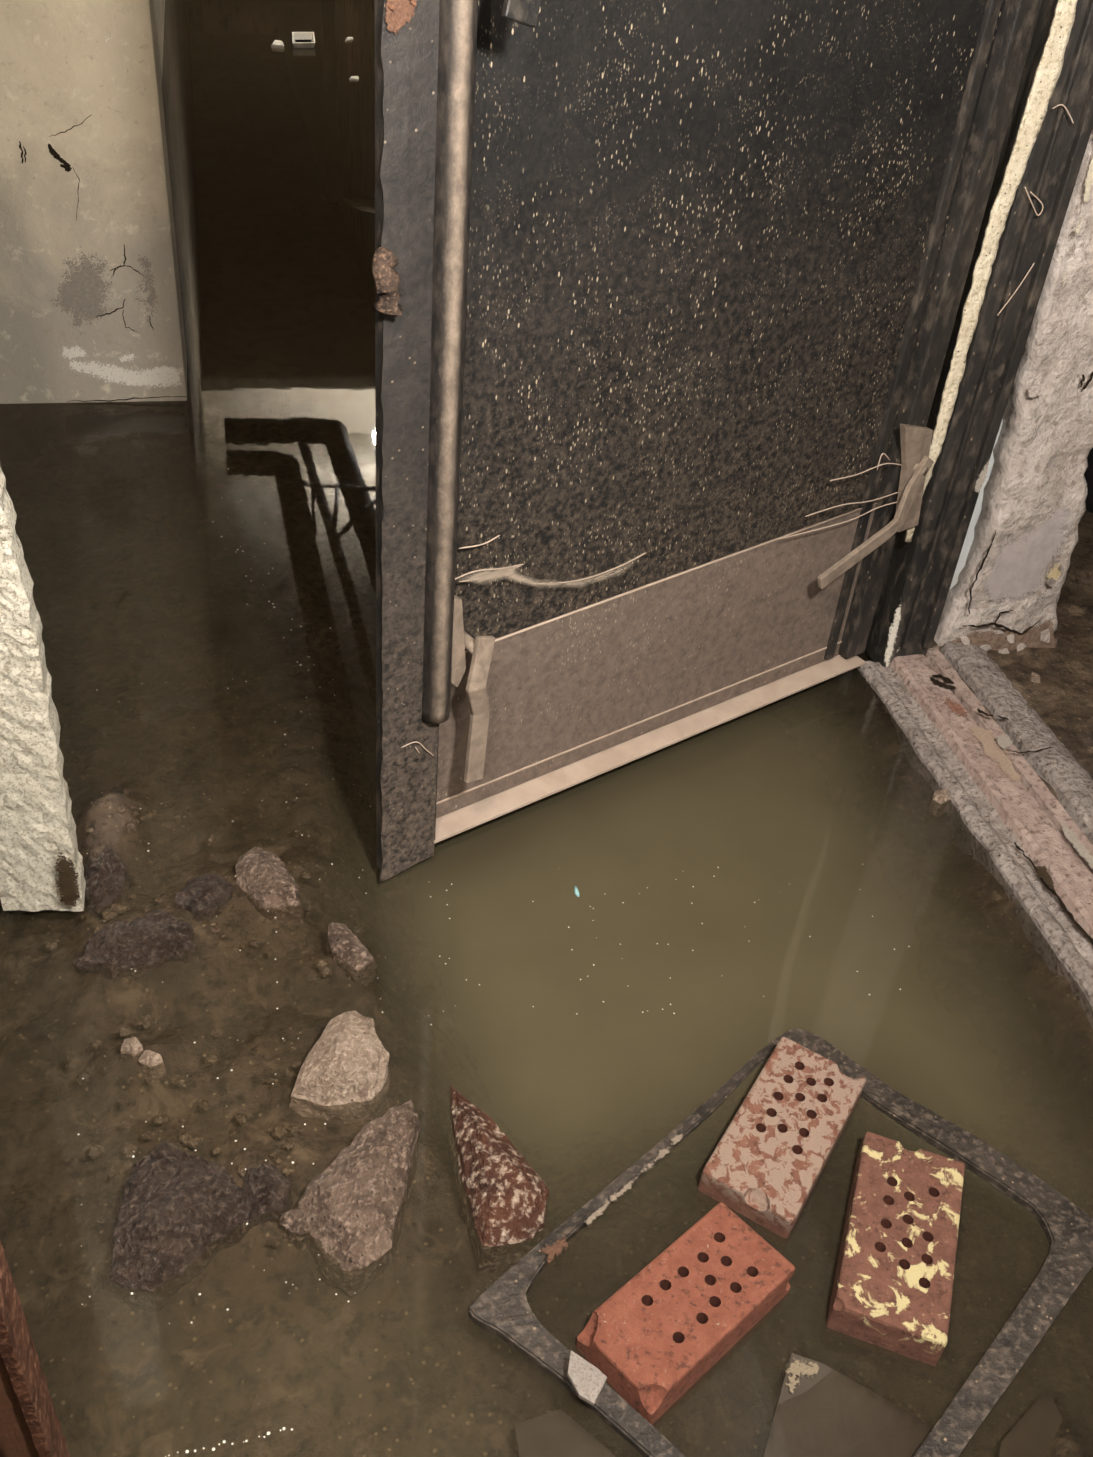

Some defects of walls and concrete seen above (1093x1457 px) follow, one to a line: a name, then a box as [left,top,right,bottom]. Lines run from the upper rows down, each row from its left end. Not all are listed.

corrosion [385,0,417,34]
flaking render [1082,155,1093,204]
peeling [974,460,990,493]
flaking render [951,618,1057,654]